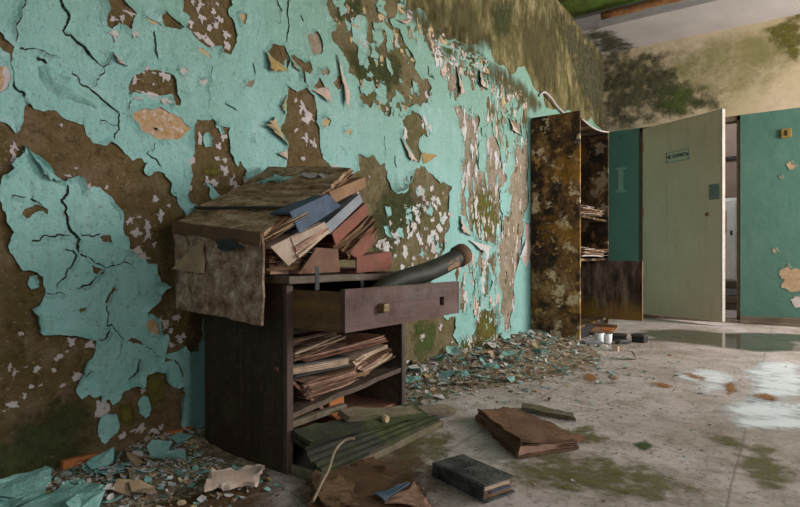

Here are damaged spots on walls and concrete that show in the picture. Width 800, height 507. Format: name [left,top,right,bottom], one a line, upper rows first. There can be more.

crack [7,0,171,175]
peeling [99,0,141,43]
peeling [121,61,213,112]
peeling [154,0,249,62]
water stain [398,0,541,111]
water stain [524,13,687,127]
peeling [262,0,531,366]
crack [12,184,143,360]
peeling [0,96,254,468]
crack [128,346,161,383]
water stain [678,369,733,393]
water stain [728,362,800,429]